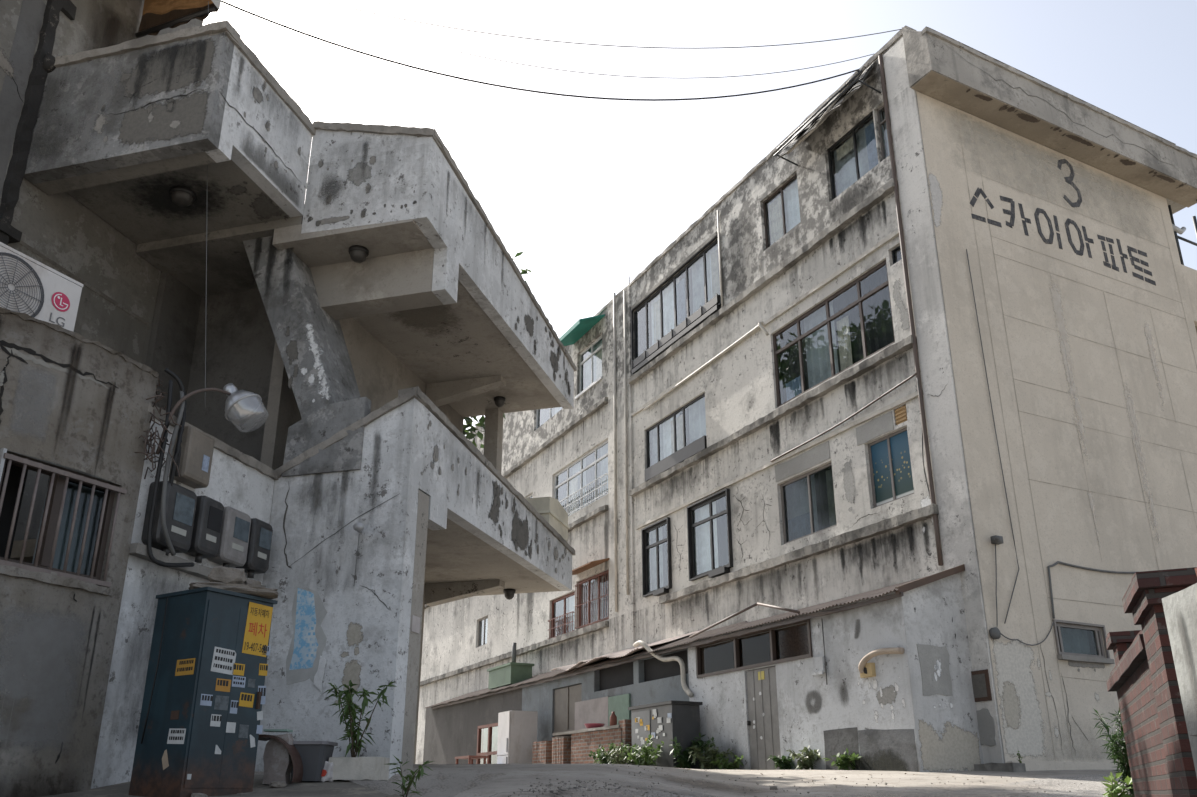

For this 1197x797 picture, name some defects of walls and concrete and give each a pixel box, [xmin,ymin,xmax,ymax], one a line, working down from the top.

water stain [132,177,224,218]
crack [0,340,119,424]
water stain [65,348,81,398]
water stain [104,387,115,422]
peeling [286,323,331,402]
crack [283,481,399,569]
peeling [488,481,569,578]
water stain [756,559,816,591]
water stain [840,523,928,574]
peeling [335,622,363,711]